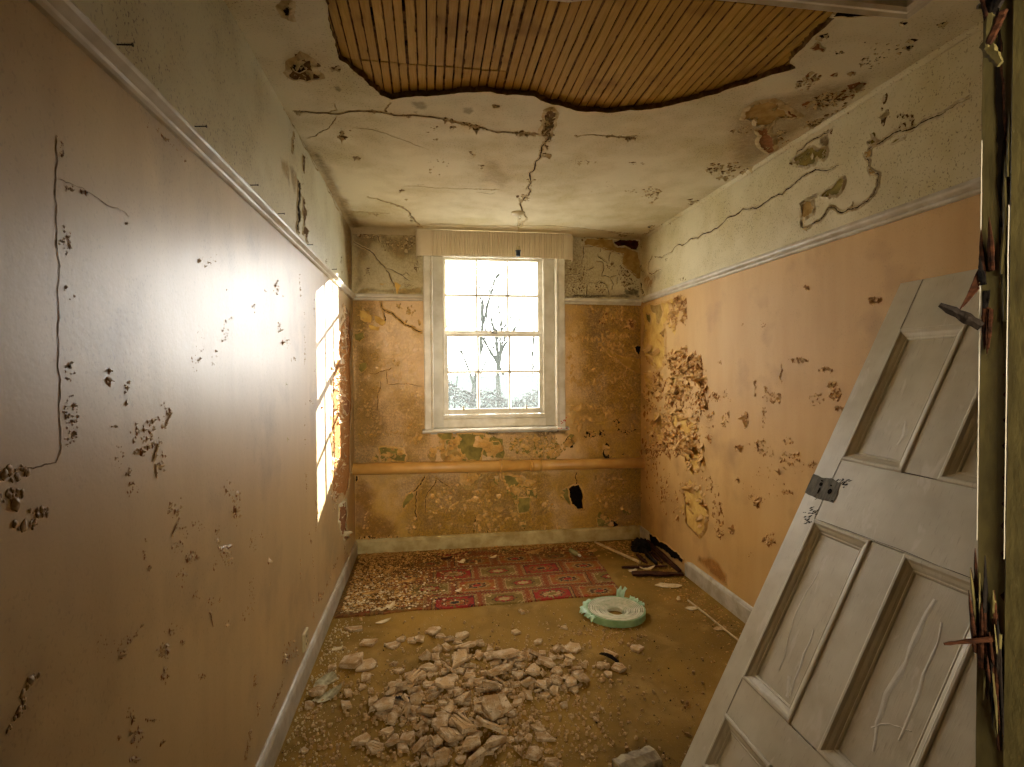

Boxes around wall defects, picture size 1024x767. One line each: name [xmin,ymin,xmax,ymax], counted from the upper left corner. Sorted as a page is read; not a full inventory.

peeling [283,51,341,83]
peeling [730,39,918,176]
crack [283,94,970,334]
peeling [799,175,847,231]
crack [1,135,129,472]
peeling [372,223,749,540]
peeling [115,405,172,497]
crack [815,500,970,578]